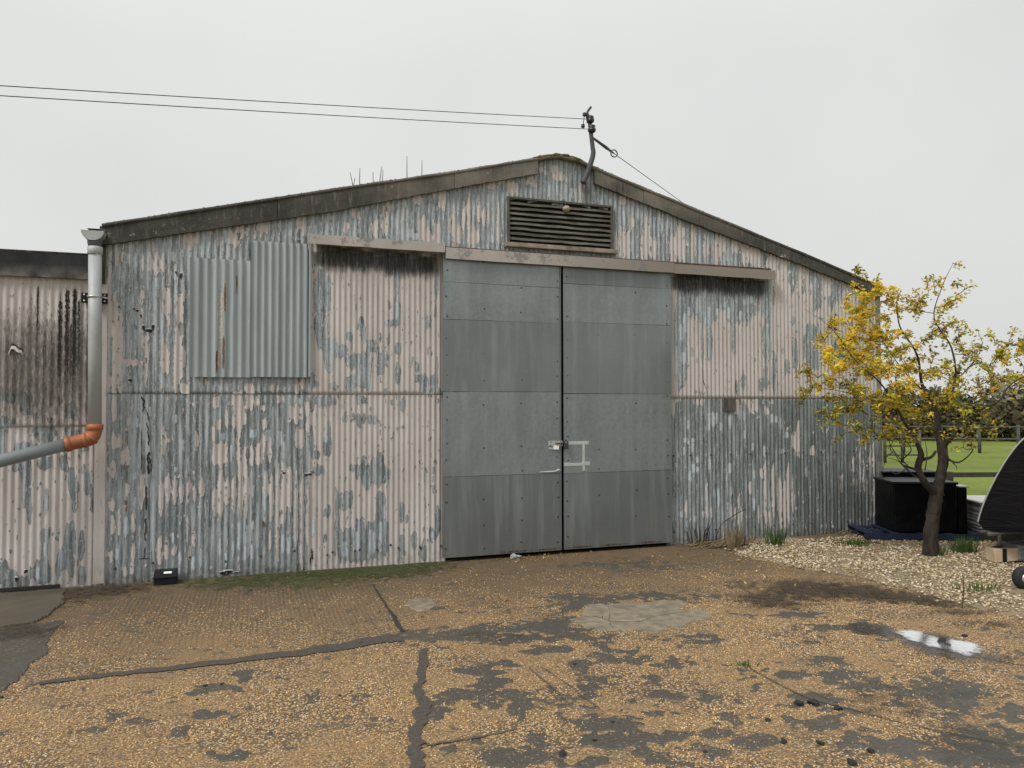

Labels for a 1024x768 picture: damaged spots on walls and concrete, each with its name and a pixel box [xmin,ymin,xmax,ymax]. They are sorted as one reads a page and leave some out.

peeling [0,325,94,588]
leakage [57,289,81,392]
peeling [104,165,875,586]
leakage [673,274,764,377]